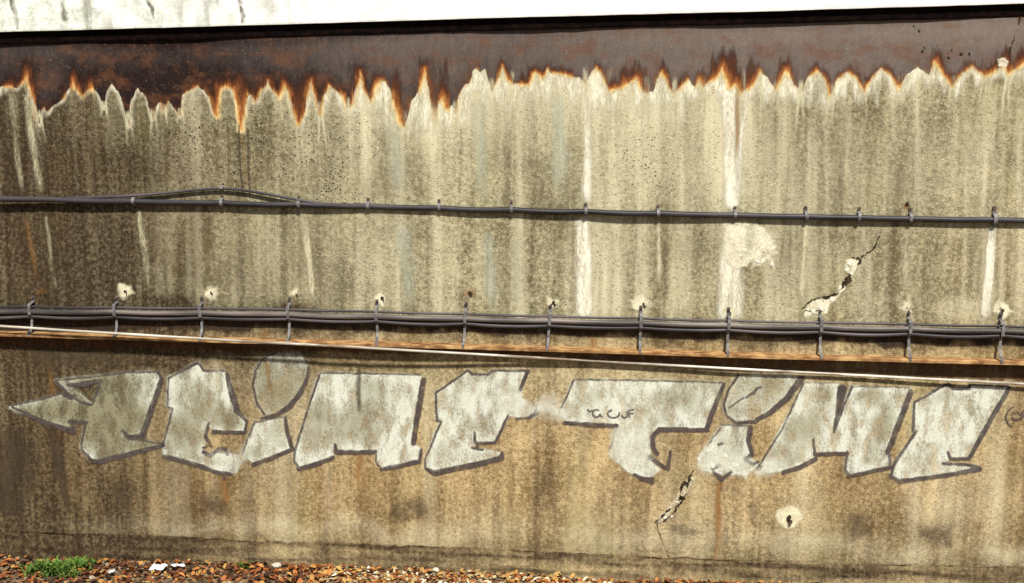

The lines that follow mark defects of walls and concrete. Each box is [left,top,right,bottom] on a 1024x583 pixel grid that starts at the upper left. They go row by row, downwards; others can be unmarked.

damp [0,82,214,183]
corrosion [185,67,404,134]
corrosion [595,63,647,93]
damp [238,66,1024,209]
corrosion [658,50,762,95]
corrosion [930,47,1024,86]
damp [577,219,592,316]
damp [719,225,742,319]
crack [802,236,880,312]
damp [982,227,995,317]
crack [655,470,694,557]
spalling [776,505,802,528]